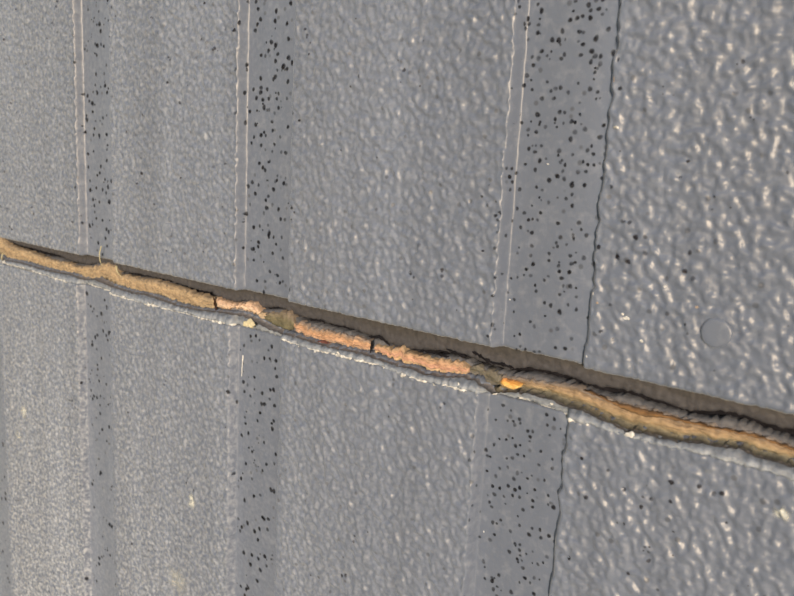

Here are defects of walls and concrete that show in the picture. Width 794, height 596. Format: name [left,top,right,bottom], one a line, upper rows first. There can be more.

crack [12,242,93,265]
crack [131,273,217,310]
crack [307,318,390,353]
crack [414,349,794,436]